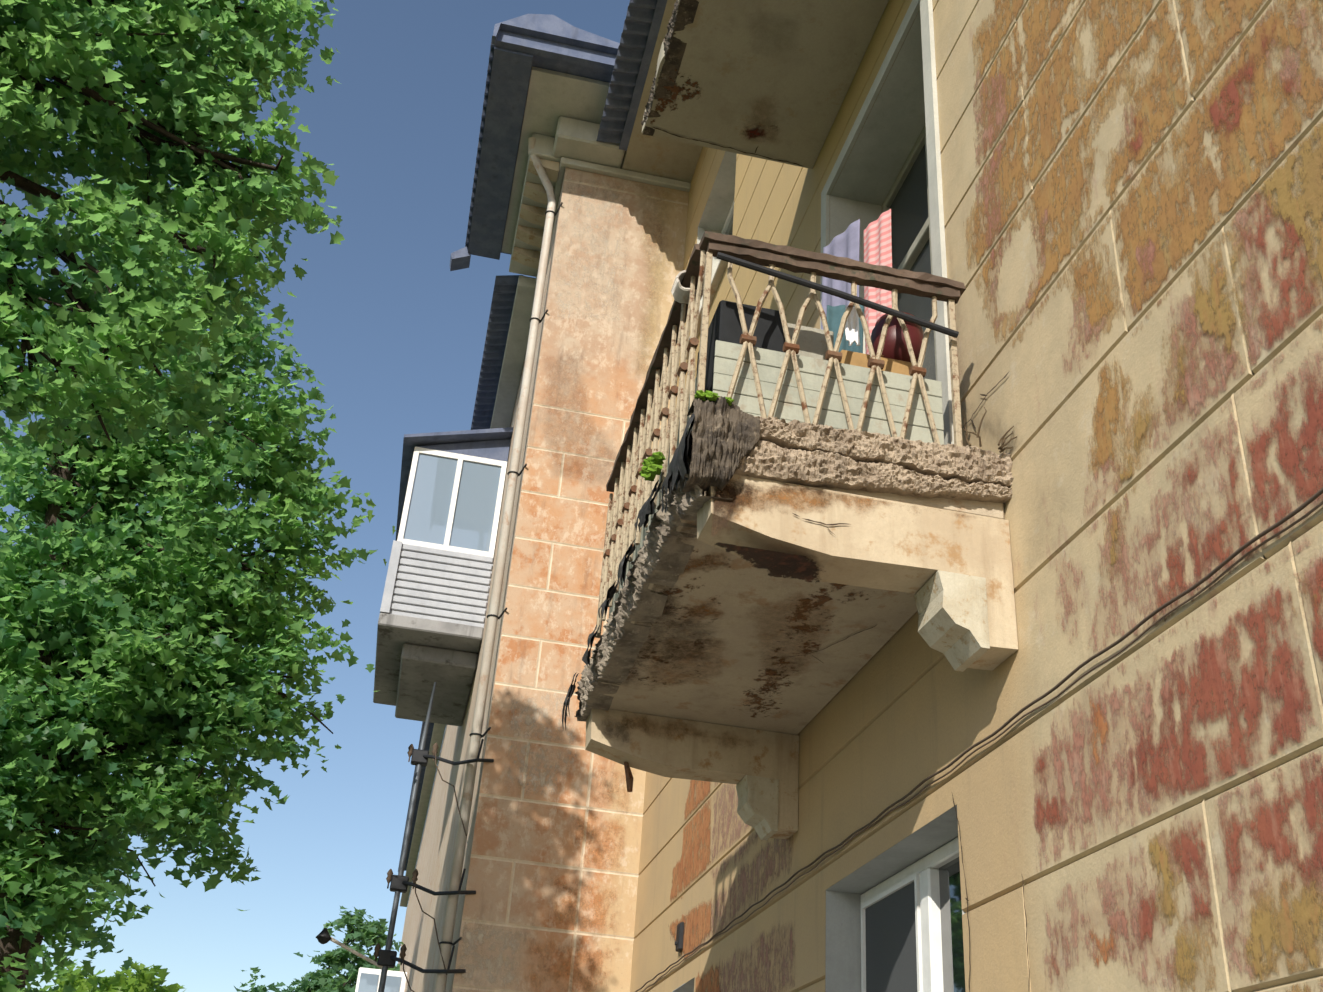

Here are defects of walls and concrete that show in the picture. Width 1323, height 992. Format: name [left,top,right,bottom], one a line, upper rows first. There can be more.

peeling [650,69,700,124]
spalling [575,431,868,722]
peeling [966,0,1323,992]
peeling [670,780,793,958]
peeling [695,929,794,992]